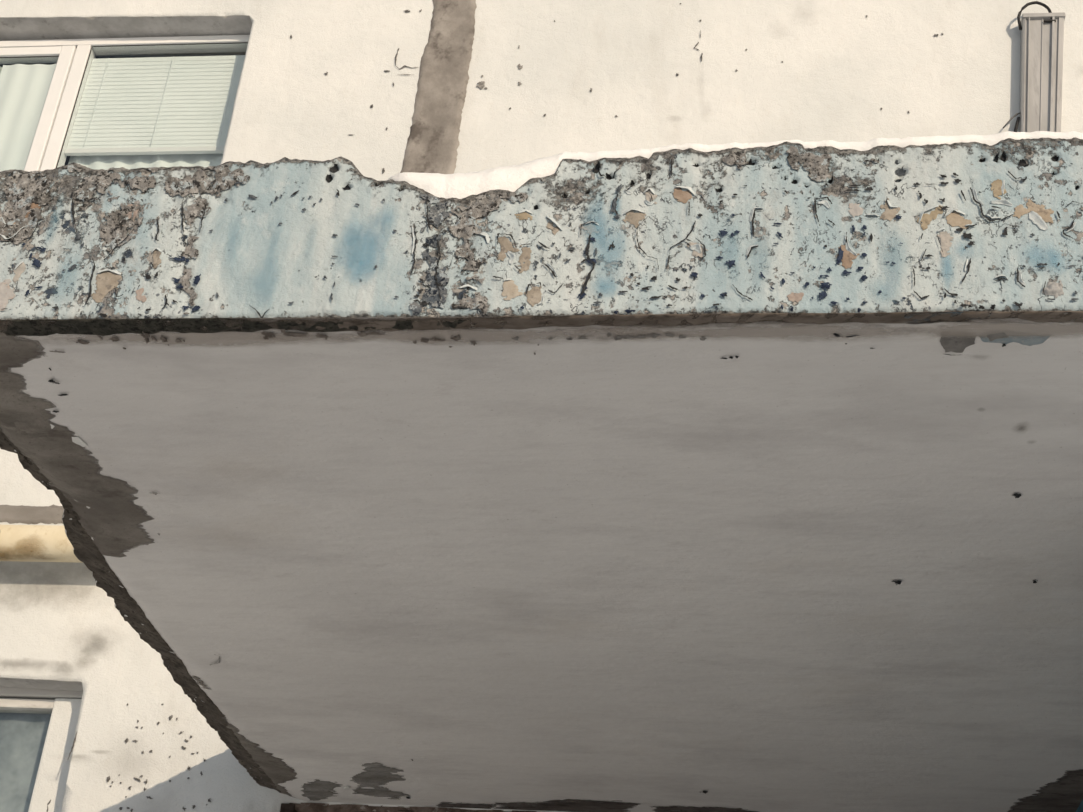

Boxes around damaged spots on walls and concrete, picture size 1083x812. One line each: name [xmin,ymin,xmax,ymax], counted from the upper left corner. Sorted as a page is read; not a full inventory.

spalling [0,171,56,311]
spalling [62,162,257,317]
spalling [326,164,350,196]
spalling [409,192,603,316]
peeling [593,162,698,306]
peeling [673,185,747,217]
spalling [722,148,755,169]
spalling [772,146,841,199]
peeling [760,160,977,313]
peeling [979,179,1054,236]
damp [0,311,1083,345]
peeling [940,332,1051,355]